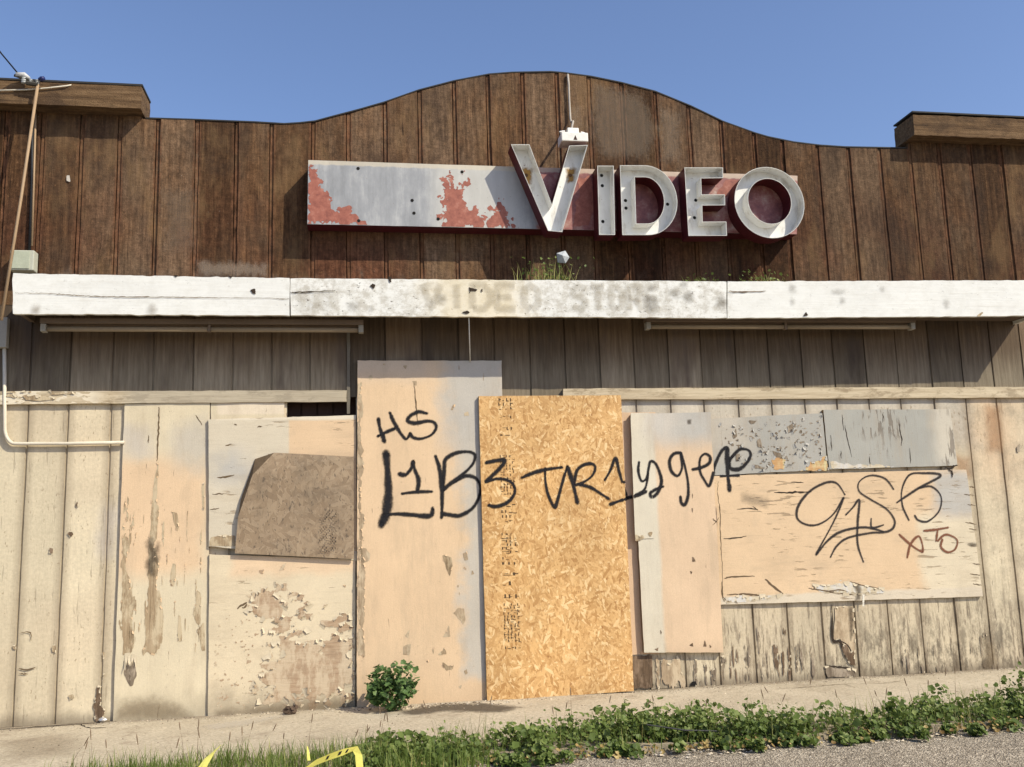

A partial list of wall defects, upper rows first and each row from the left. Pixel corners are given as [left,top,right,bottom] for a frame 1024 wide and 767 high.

peeling [308,165,367,225]
peeling [436,170,519,228]
peeling [718,415,894,472]
peeling [119,375,373,710]
peeling [632,579,885,689]